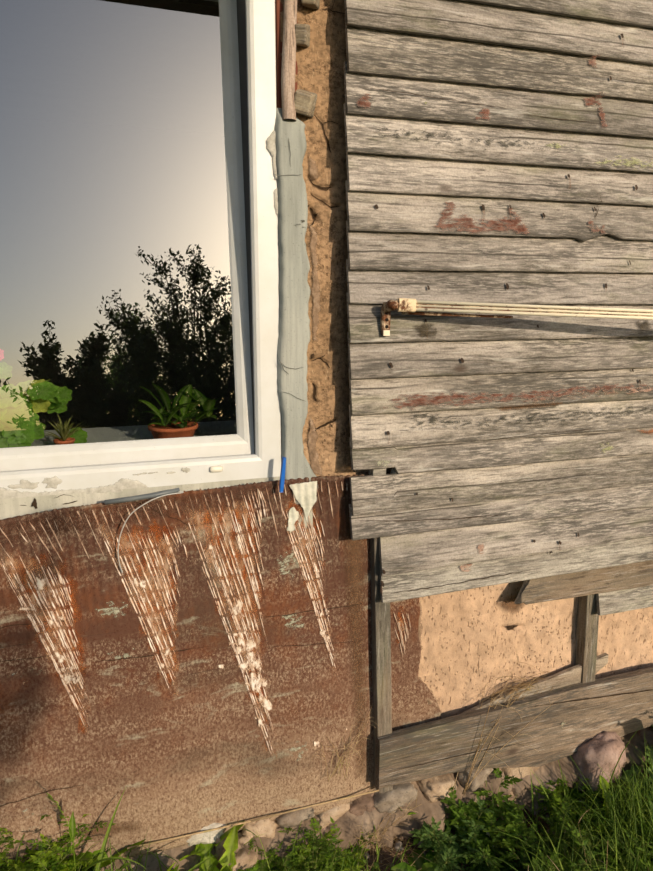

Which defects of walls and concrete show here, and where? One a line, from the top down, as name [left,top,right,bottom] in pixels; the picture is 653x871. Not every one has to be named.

crack [314,115,338,152]
peeling [8,476,62,489]
peeling [17,499,181,567]
peeling [189,481,348,538]
corrosion [1,552,90,734]
corrosion [99,489,274,753]
corrosion [279,500,339,678]